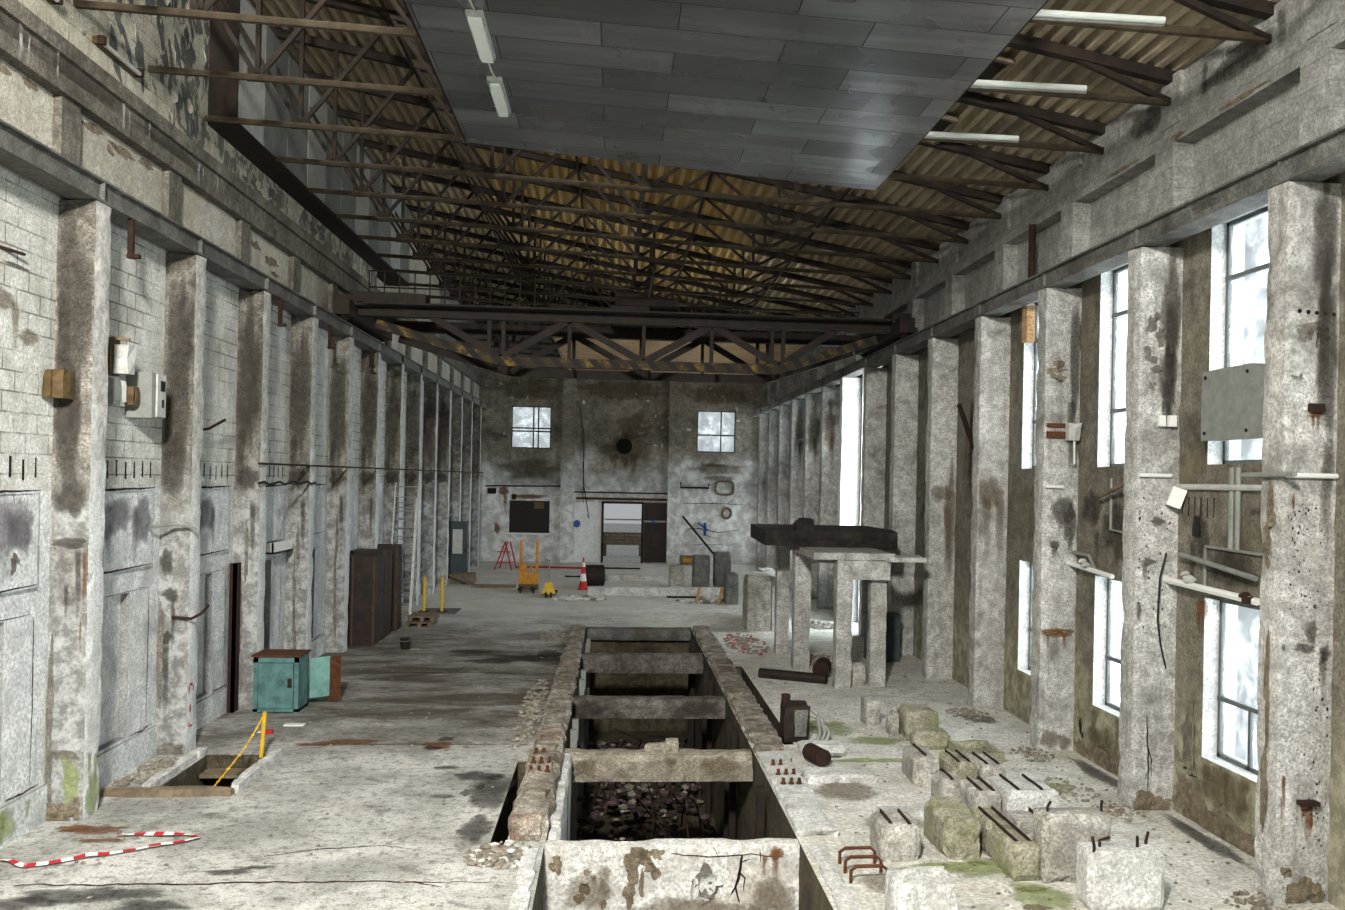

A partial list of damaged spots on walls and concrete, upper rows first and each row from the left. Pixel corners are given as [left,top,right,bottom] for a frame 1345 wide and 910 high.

damp [0,507,32,553]
damp [105,500,150,533]
rust [1042,628,1071,641]
rust [1301,807,1313,829]
crack [671,847,783,902]